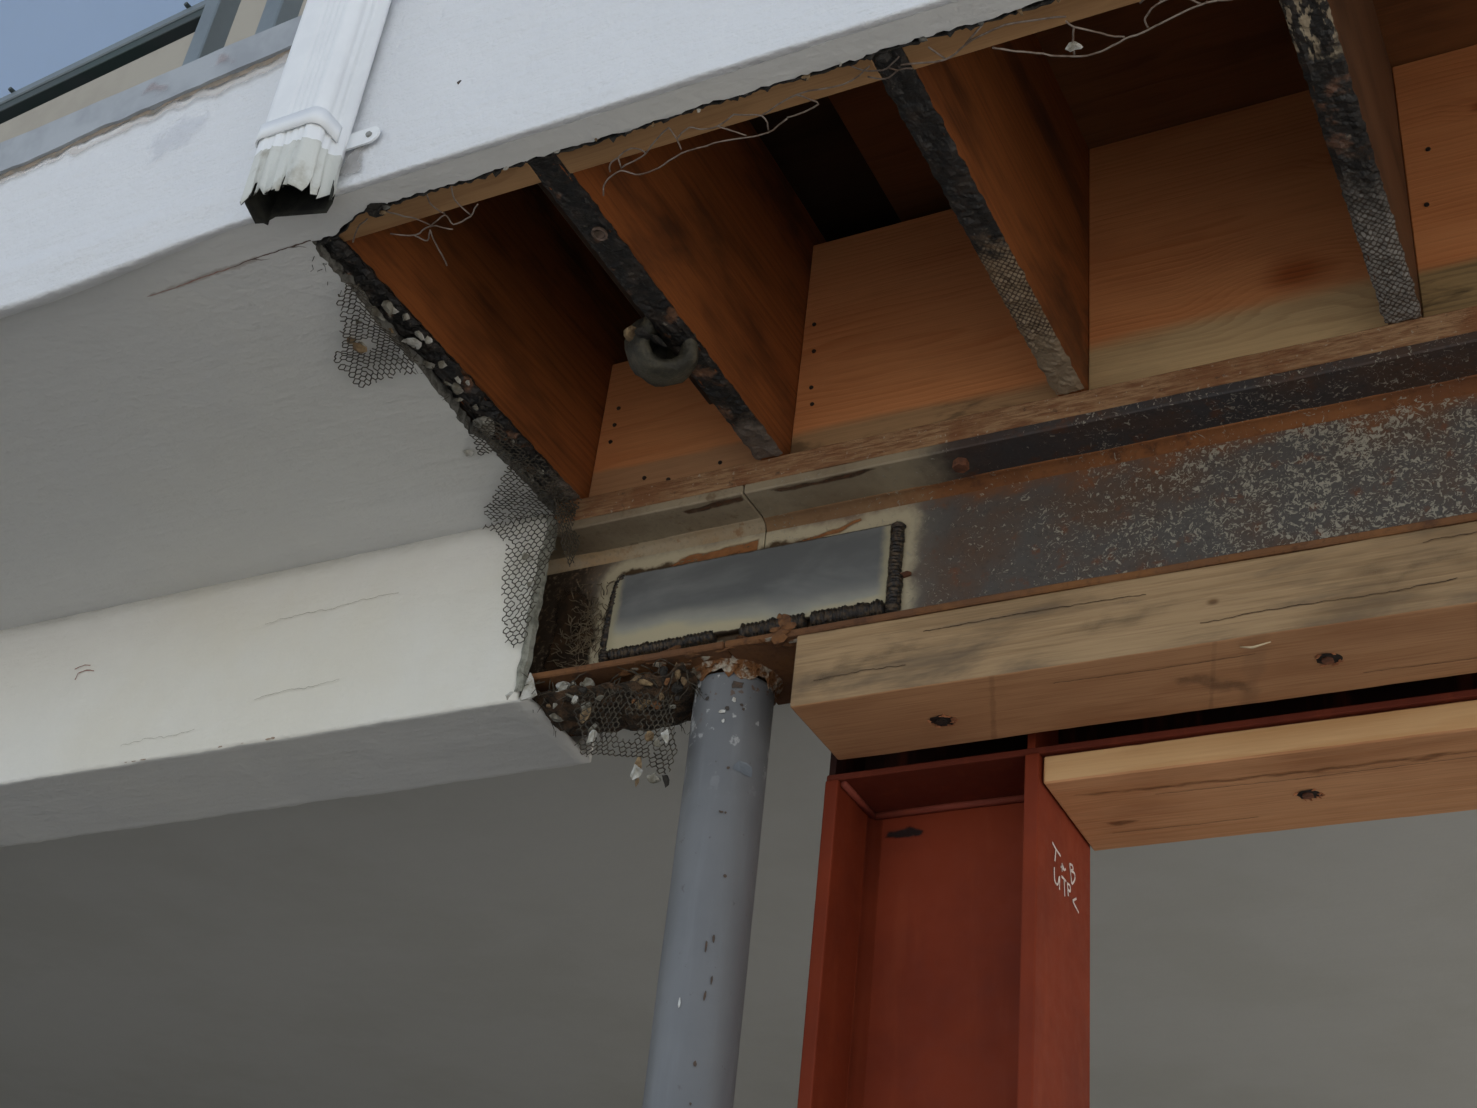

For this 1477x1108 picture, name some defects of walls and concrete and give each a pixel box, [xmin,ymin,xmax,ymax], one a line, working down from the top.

crack [147,240,311,297]
spalling [312,236,745,748]